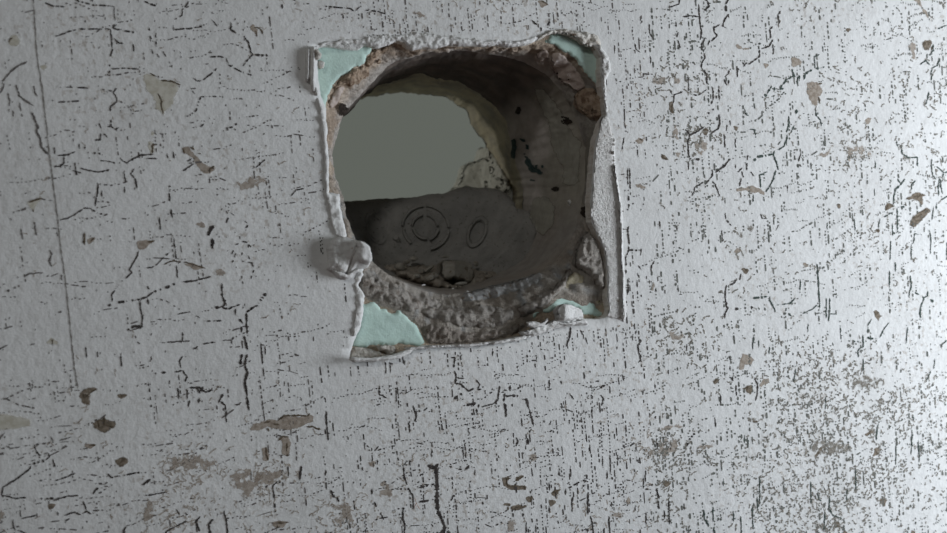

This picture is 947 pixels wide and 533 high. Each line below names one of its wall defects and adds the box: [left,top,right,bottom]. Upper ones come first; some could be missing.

crack [0,0,314,226]
peeling [807,82,823,106]
crack [0,222,97,300]
crack [94,210,215,353]
crack [207,225,227,248]
crack [221,144,328,284]
spalling [326,34,604,362]
peeling [906,192,930,227]
crack [1,360,91,421]
peeling [79,387,97,405]
peeling [250,413,321,456]
peeling [230,448,281,497]